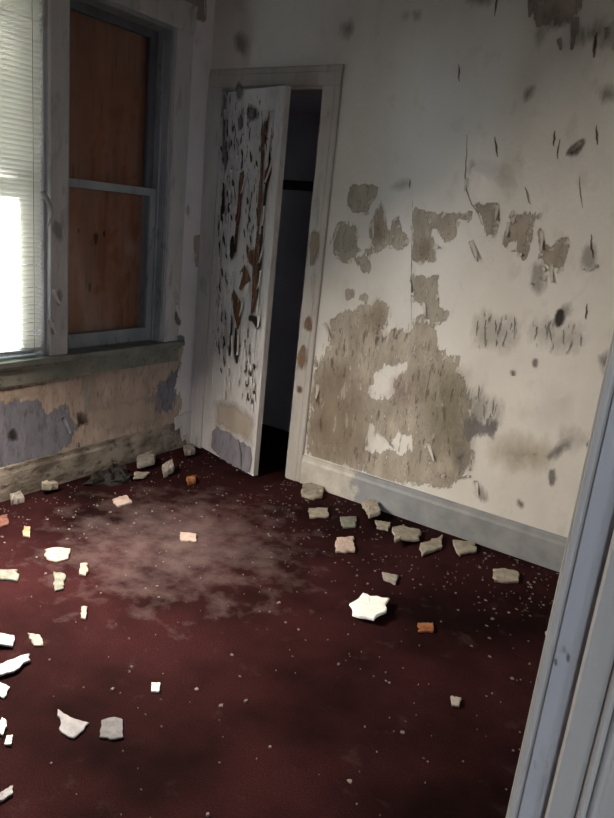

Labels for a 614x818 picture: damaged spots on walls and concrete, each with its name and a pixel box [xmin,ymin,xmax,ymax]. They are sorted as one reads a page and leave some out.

peeling [528,0,582,51]
peeling [216,91,274,413]
peeling [330,184,570,283]
peeling [476,316,516,347]
spalling [535,309,582,349]
peeling [0,335,184,453]
peeling [306,274,475,489]
spalling [162,459,174,478]